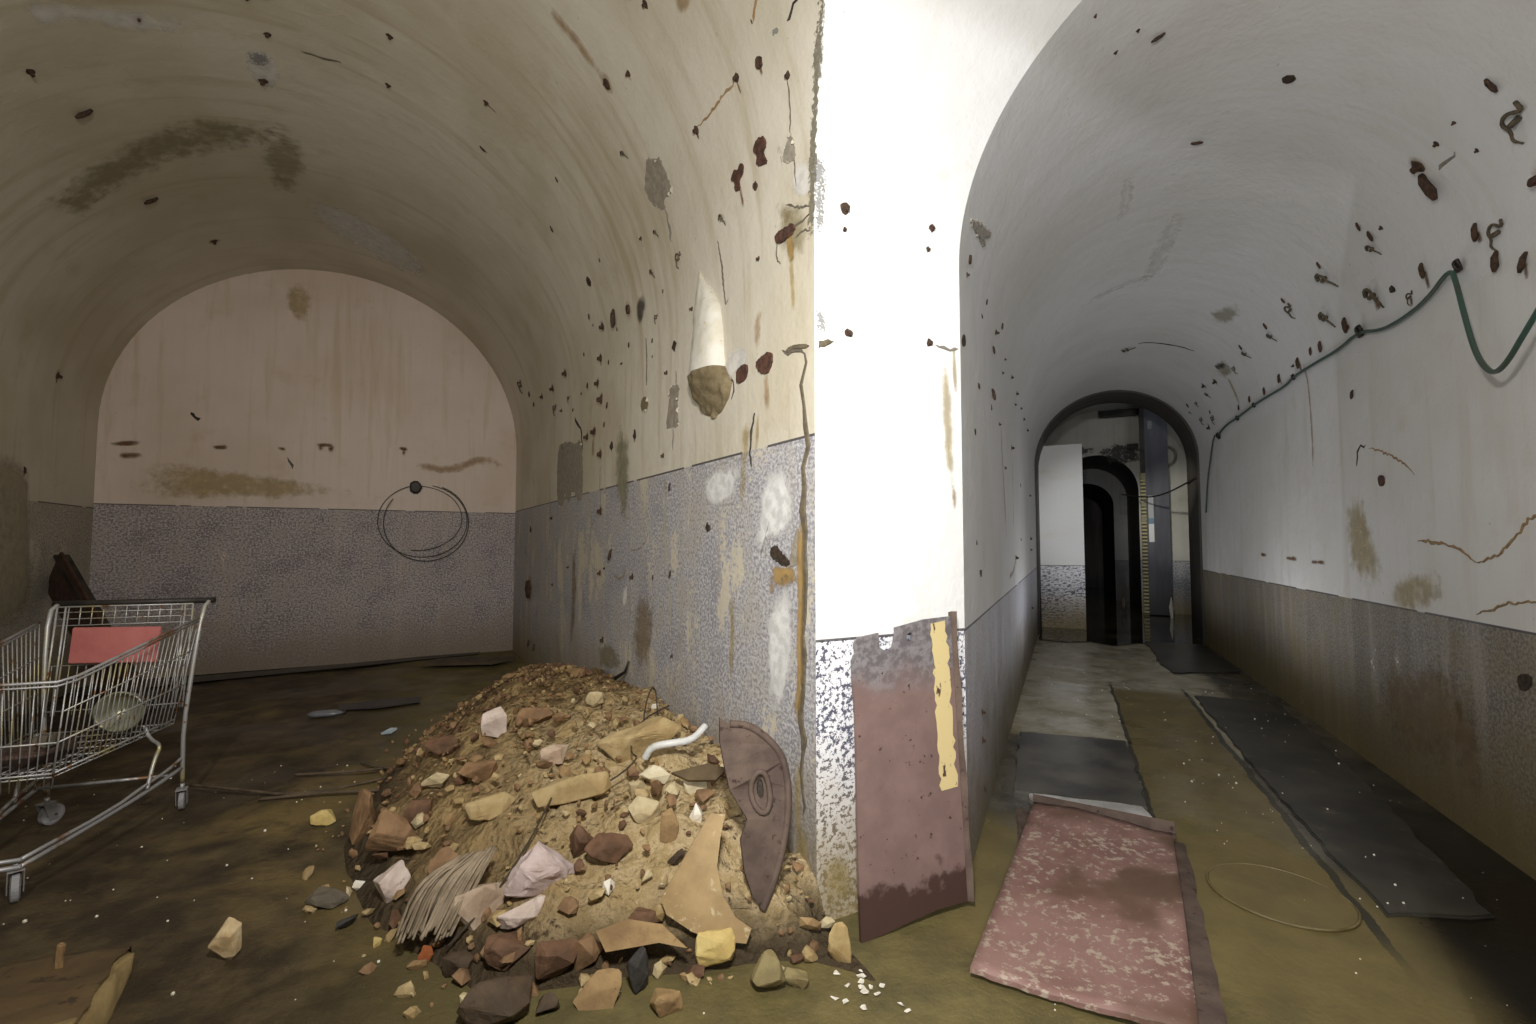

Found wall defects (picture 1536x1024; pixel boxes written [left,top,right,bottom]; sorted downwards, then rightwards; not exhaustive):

crack [1356,444,1414,474]
crack [1418,514,1536,563]
crack [1476,600,1536,615]